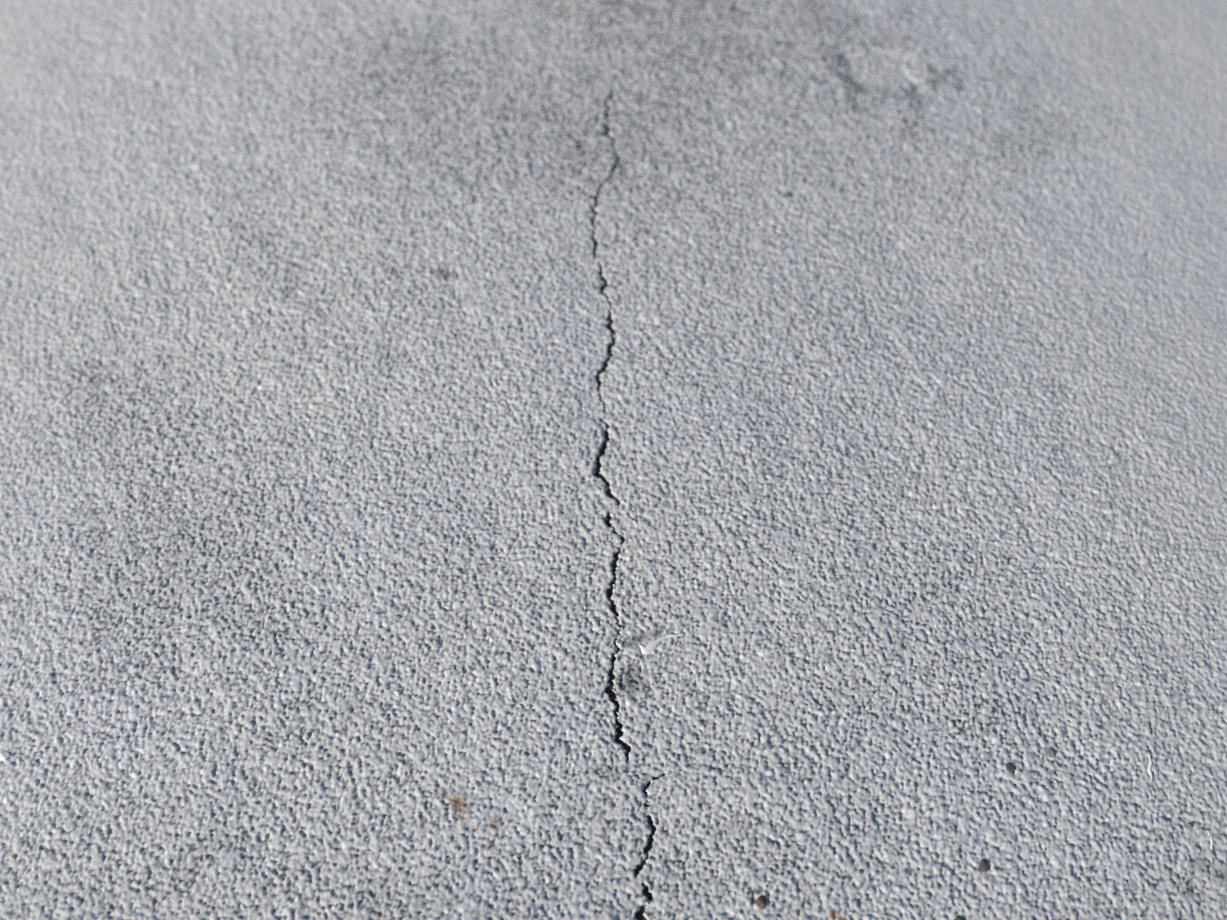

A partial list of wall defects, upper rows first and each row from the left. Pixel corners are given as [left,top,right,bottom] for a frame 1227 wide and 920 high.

crack [591,96,631,761]
crack [634,775,664,920]